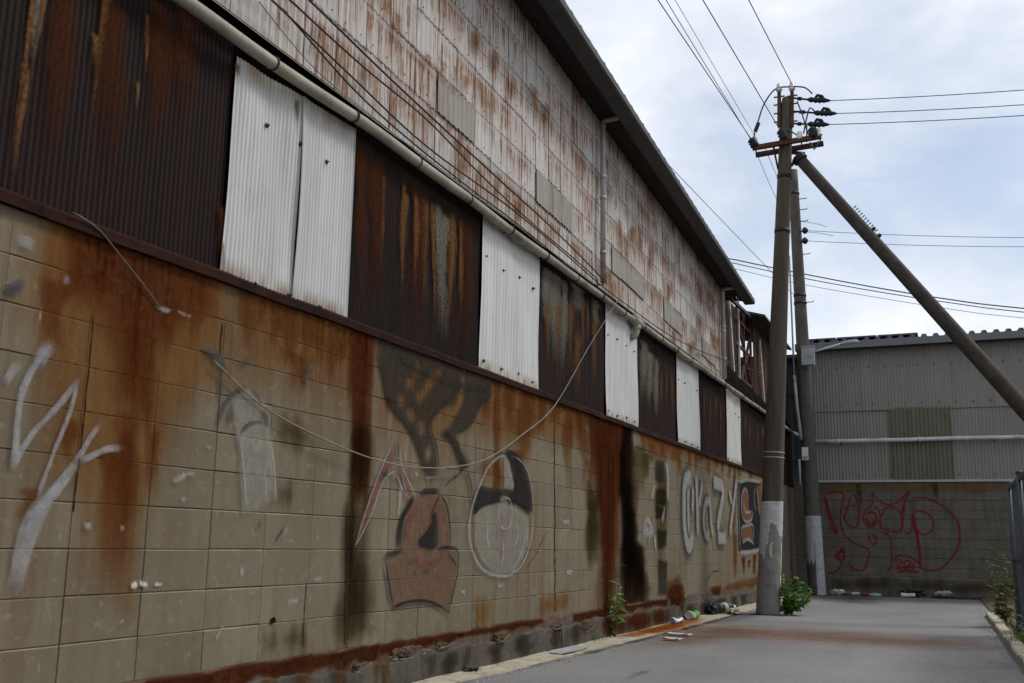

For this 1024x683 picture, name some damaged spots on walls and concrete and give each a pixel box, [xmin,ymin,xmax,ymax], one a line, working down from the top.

rust [19,0,46,131]
rust [92,0,111,72]
rust [393,14,469,96]
rust [473,31,550,123]
rust [357,148,385,255]
rust [401,185,436,298]
rust [449,216,472,304]
rust [614,219,679,312]
crack [73,313,94,512]
rust [350,328,375,501]
rust [574,412,686,635]
water stain [620,426,648,605]